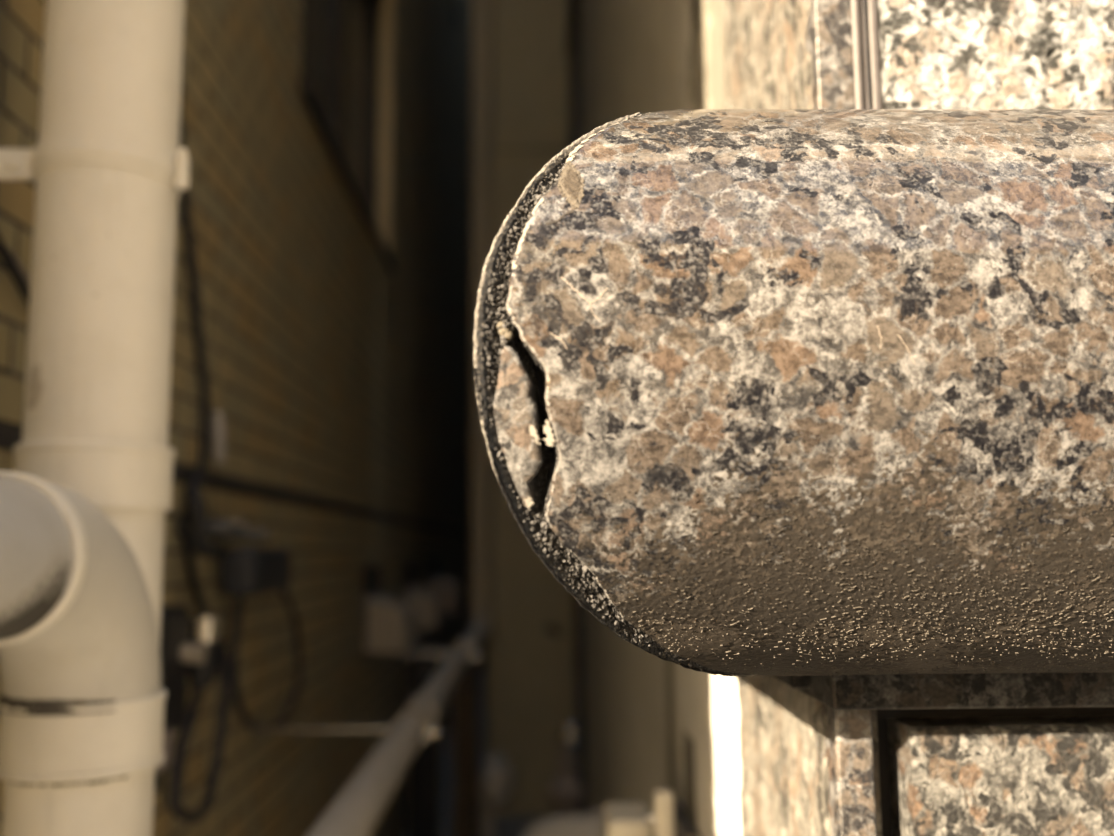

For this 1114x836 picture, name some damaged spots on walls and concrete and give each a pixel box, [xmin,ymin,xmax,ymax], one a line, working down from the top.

crack [537,369,546,425]